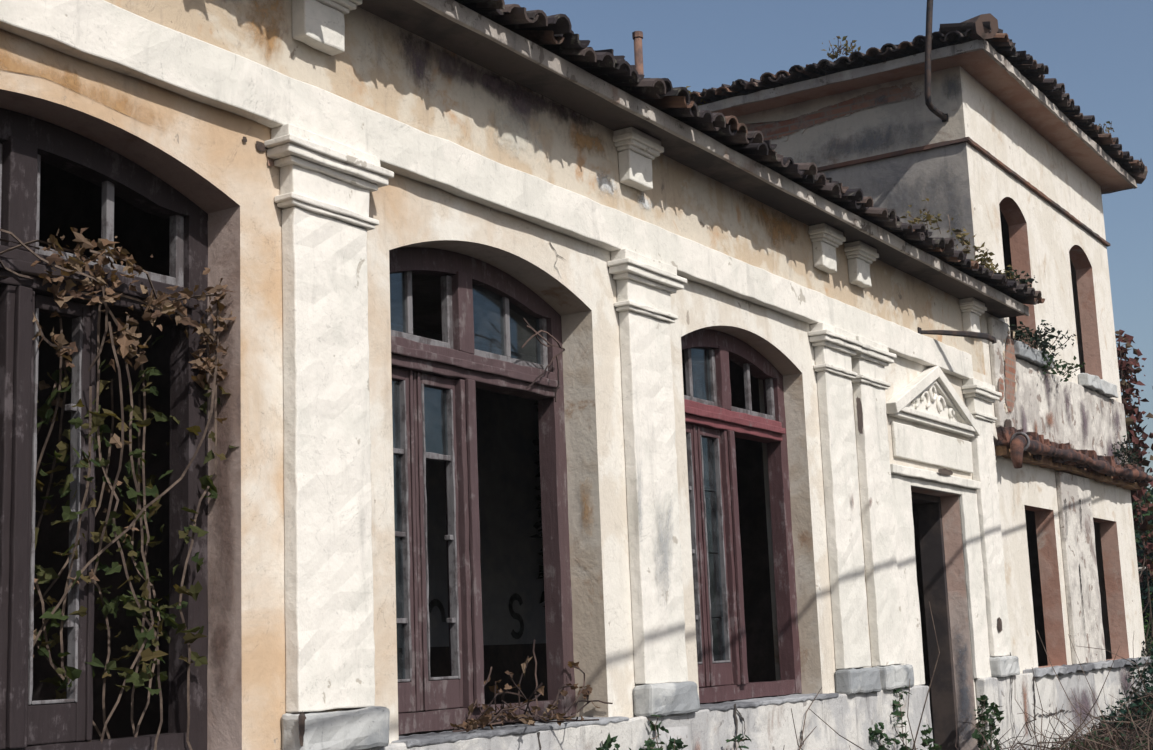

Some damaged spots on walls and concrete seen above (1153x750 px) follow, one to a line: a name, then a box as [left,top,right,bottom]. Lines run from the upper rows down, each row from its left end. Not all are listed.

water stain [404,41,590,125]
flaking render [745,77,924,142]
water stain [1065,388,1088,438]